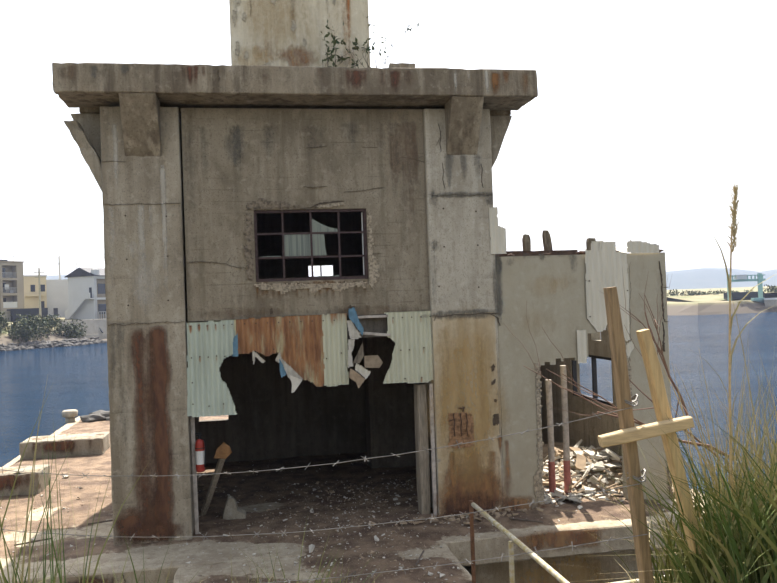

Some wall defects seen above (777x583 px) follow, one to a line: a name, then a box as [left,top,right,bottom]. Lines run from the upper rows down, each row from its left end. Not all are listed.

rust [187,66,204,83]
rust [282,49,311,66]
rust [492,72,508,91]
crack [373,124,492,196]
spalling [242,198,380,295]
rust [116,326,180,543]
rust [0,475,29,490]
peeling [198,362,584,583]
rust [439,436,531,517]